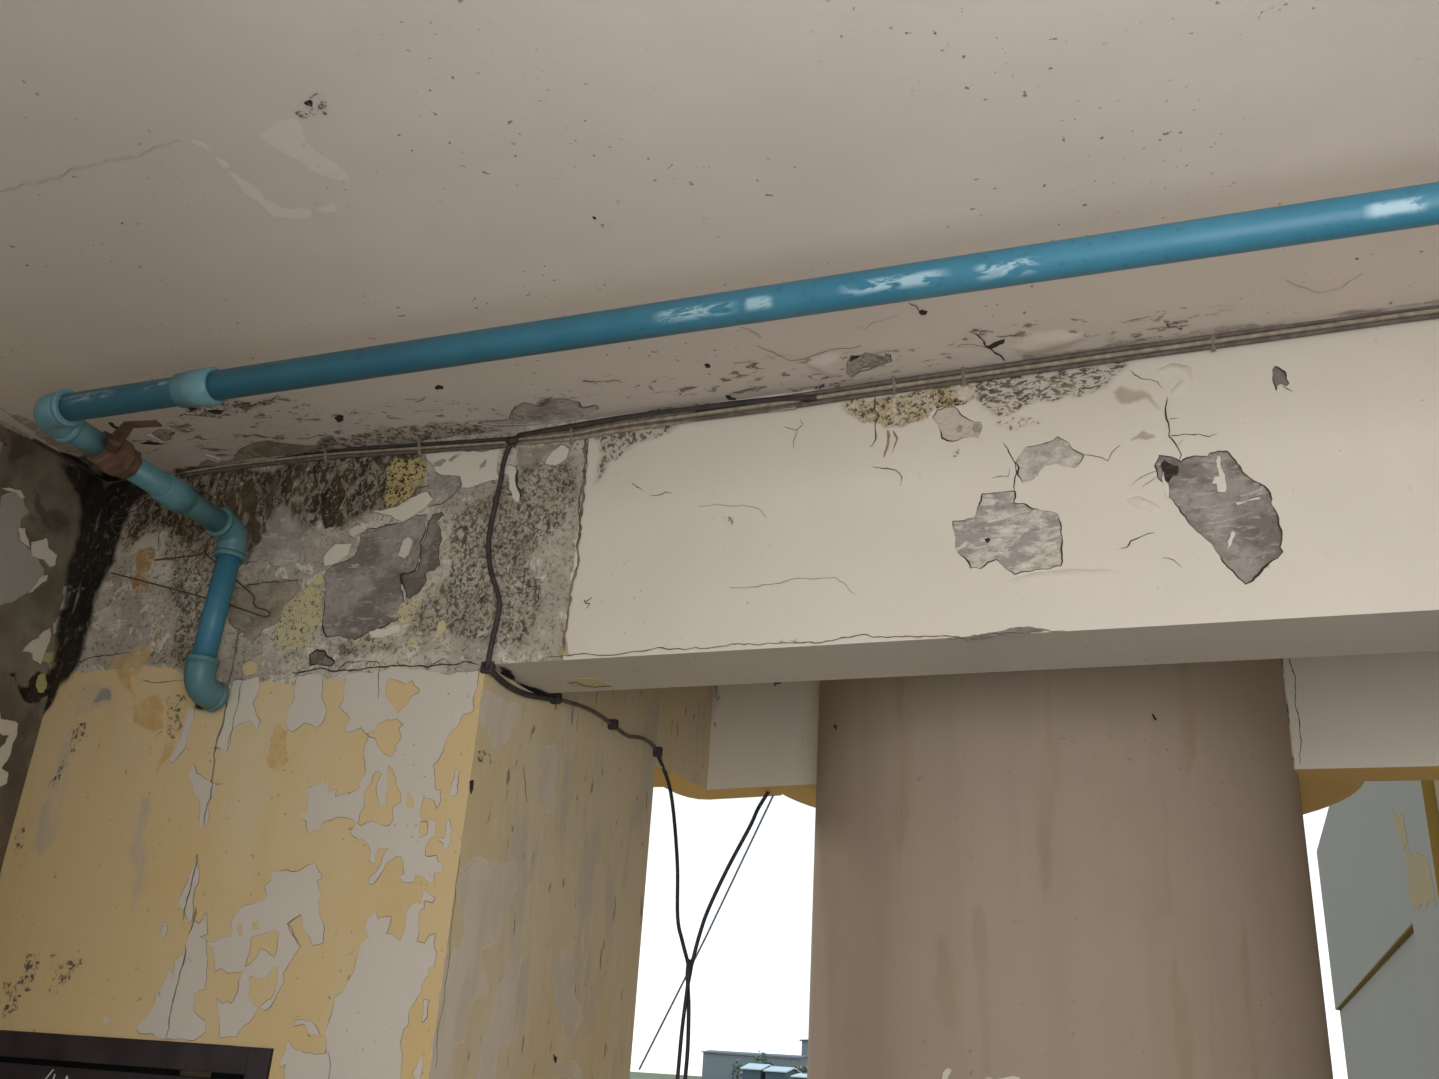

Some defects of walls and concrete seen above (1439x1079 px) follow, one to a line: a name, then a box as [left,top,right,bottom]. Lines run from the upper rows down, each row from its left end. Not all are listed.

peeling [0,487,57,605]
peeling [115,515,163,558]
peeling [425,448,520,502]
spalling [932,400,982,442]
spalling [952,436,1084,575]
spalling [1154,450,1283,585]
peeling [22,585,75,670]
peeling [0,713,18,787]
peeling [218,677,261,752]
peeling [227,478,521,1079]
crack [166,854,198,1037]
peeling [136,854,325,1041]